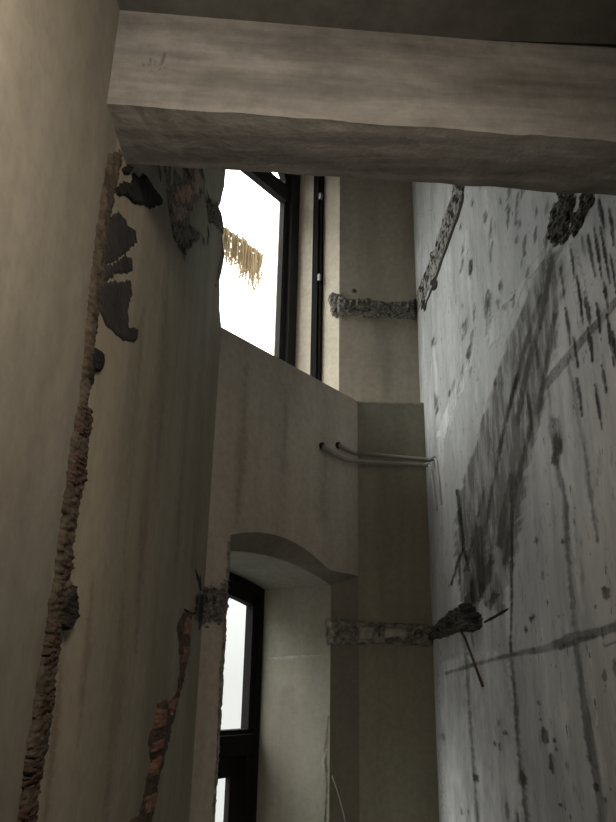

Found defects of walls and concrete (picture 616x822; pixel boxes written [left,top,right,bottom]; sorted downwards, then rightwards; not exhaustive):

spalling [328,185,473,320]
spalling [547,193,595,247]
flaking render [17,149,231,822]
spalling [325,602,484,687]